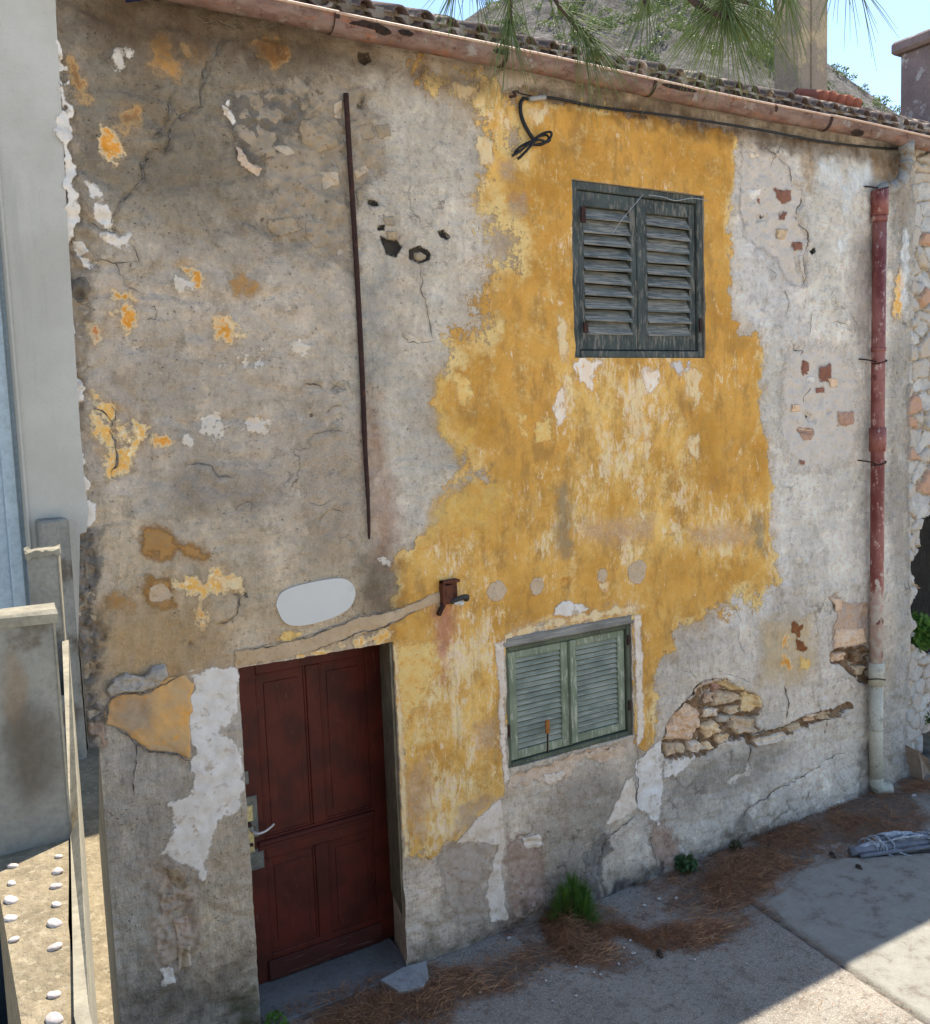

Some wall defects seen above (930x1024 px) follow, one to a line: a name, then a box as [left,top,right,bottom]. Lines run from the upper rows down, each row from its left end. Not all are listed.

flaking render [59,56,227,480]
crack [89,39,225,320]
flaking render [222,37,391,273]
peeling [79,527,245,987]
crack [236,597,426,655]
peeling [296,52,869,930]
crack [729,686,846,828]